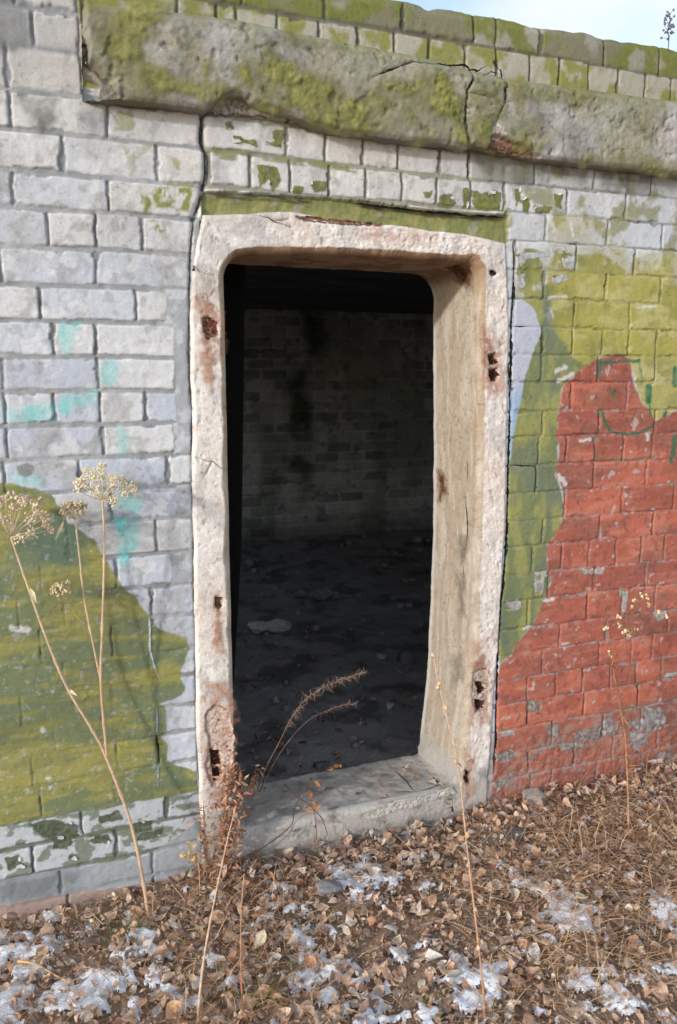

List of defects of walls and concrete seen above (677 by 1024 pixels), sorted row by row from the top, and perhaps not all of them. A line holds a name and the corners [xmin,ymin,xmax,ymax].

crack [376,53,508,176]
crack [351,203,504,219]
corrosion [202,302,220,379]
crack [187,119,312,494]
crack [493,246,537,770]
crack [190,539,198,626]
spalling [206,705,235,787]
peeling [628,704,673,769]
peeling [4,855,25,870]
peeling [29,810,163,861]